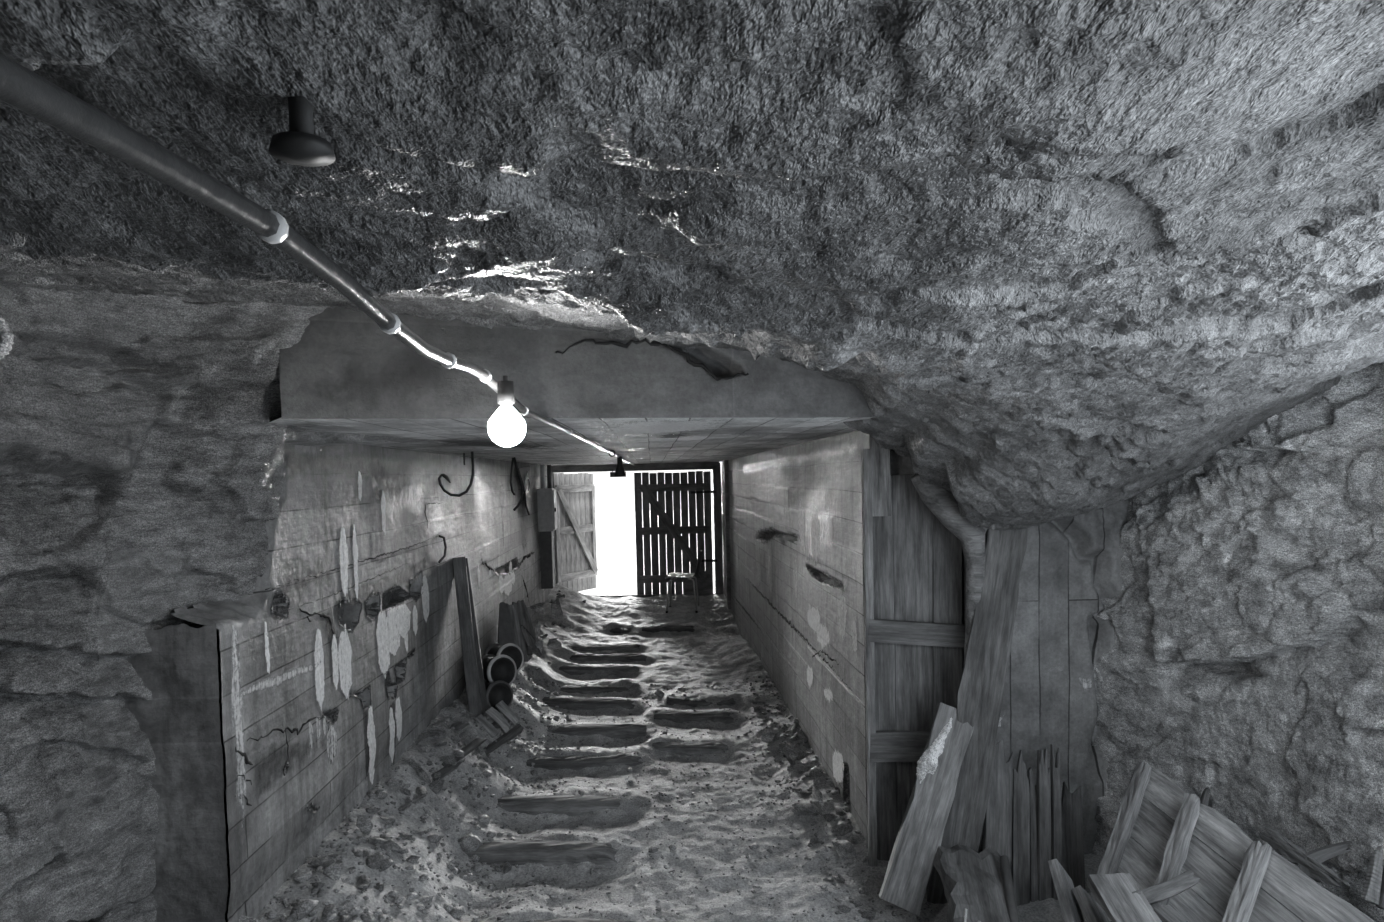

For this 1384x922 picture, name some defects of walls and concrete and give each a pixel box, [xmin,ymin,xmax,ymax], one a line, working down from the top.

crack [555,338,749,381]
spalling [271,590,290,620]
spalling [336,535,447,633]
spalling [349,648,415,711]
spalling [322,709,340,726]
crack [235,717,320,806]